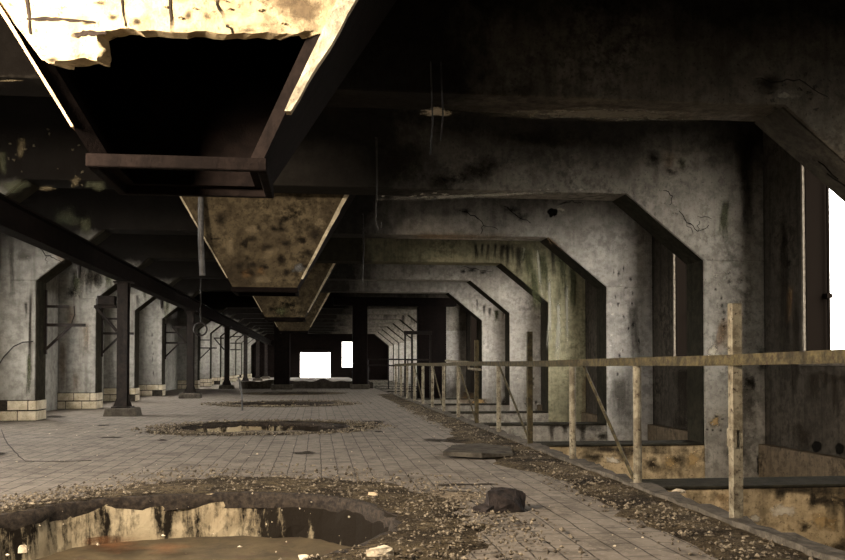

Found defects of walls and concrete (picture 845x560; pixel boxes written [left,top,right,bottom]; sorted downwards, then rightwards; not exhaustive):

crack [25,0,126,38]
crack [167,0,175,32]
peeling [173,7,196,30]
crack [216,0,233,33]
peeling [222,0,264,31]
crack [663,190,711,233]
water stain [475,244,576,345]
spalling [180,421,350,433]
water stain [549,422,592,439]
water stain [589,434,633,460]
water stain [769,487,845,524]
spalling [0,491,402,560]